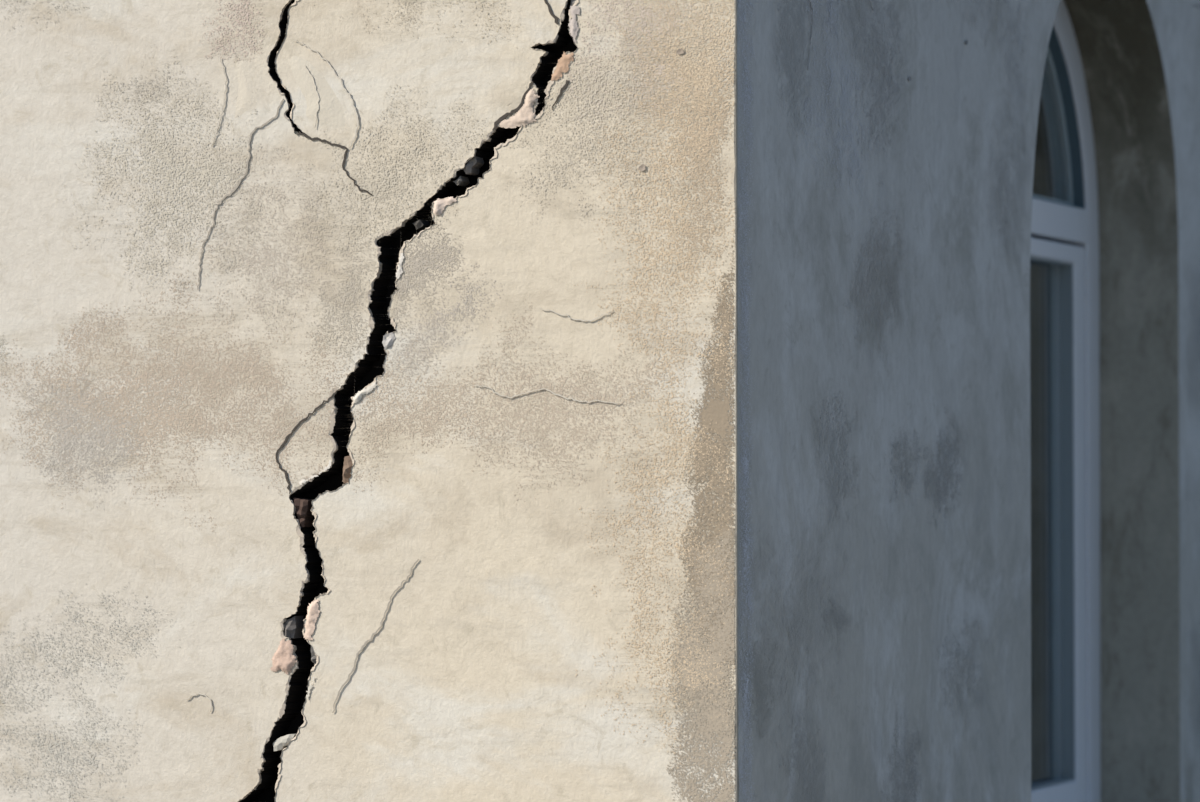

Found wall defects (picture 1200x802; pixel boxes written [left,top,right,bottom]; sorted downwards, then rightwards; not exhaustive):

crack [197,0,372,290]
crack [240,0,577,802]
leakage [501,0,779,802]